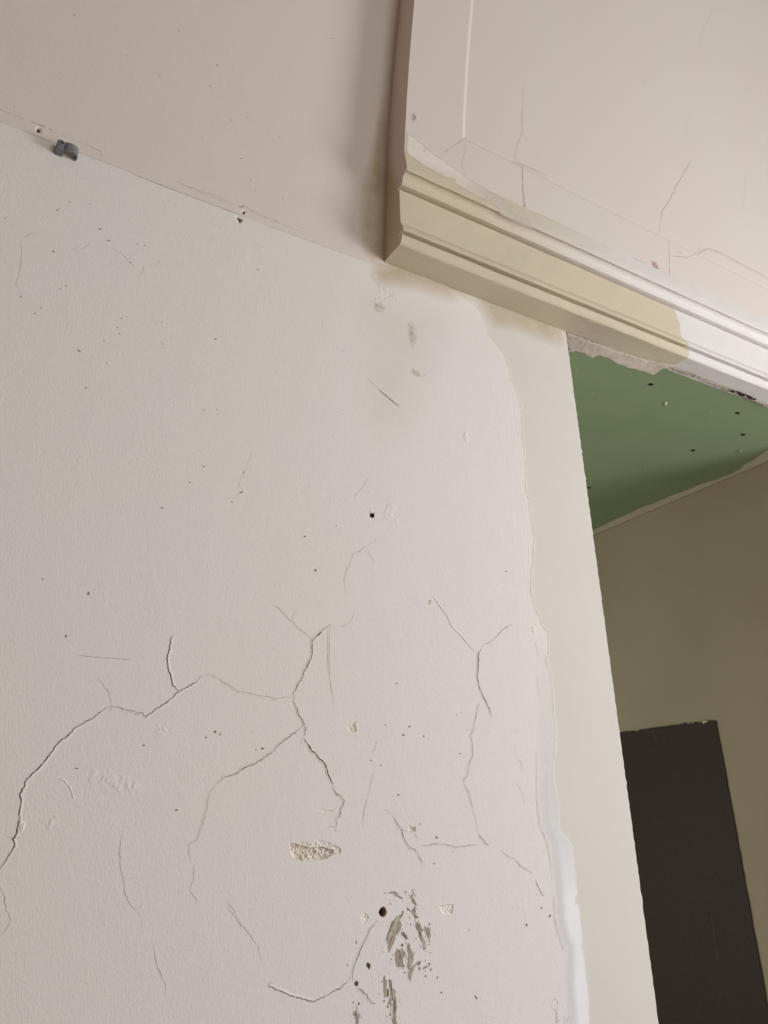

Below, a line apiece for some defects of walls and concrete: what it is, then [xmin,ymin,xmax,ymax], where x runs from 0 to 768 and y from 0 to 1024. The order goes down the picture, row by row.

crack [0,540,375,937]
crack [385,595,563,951]
spalling [289,840,341,862]
crack [153,944,167,995]
crack [224,898,377,1006]